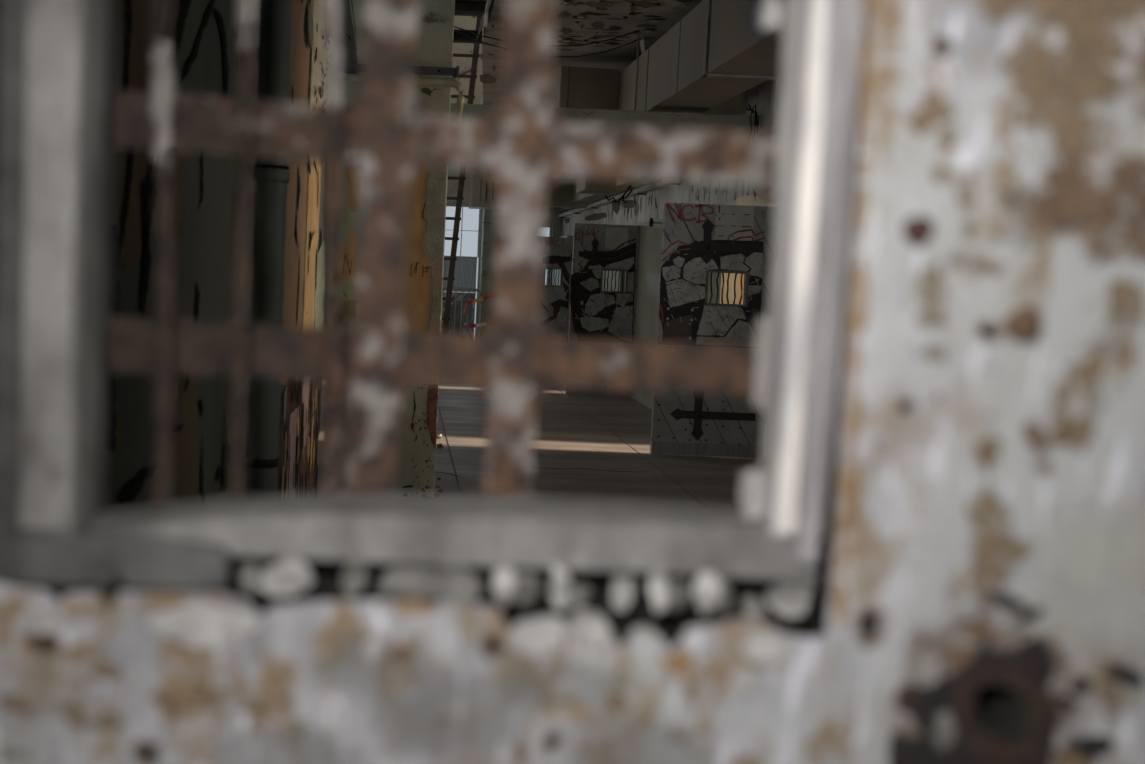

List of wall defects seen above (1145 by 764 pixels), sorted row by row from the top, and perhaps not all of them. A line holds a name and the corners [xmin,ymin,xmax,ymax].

crack [175,0,229,98]
peeling [555,0,694,54]
crack [121,148,157,318]
corrosion [977,437,998,473]
corrosion [966,490,1029,604]
corrosion [949,661,1145,764]